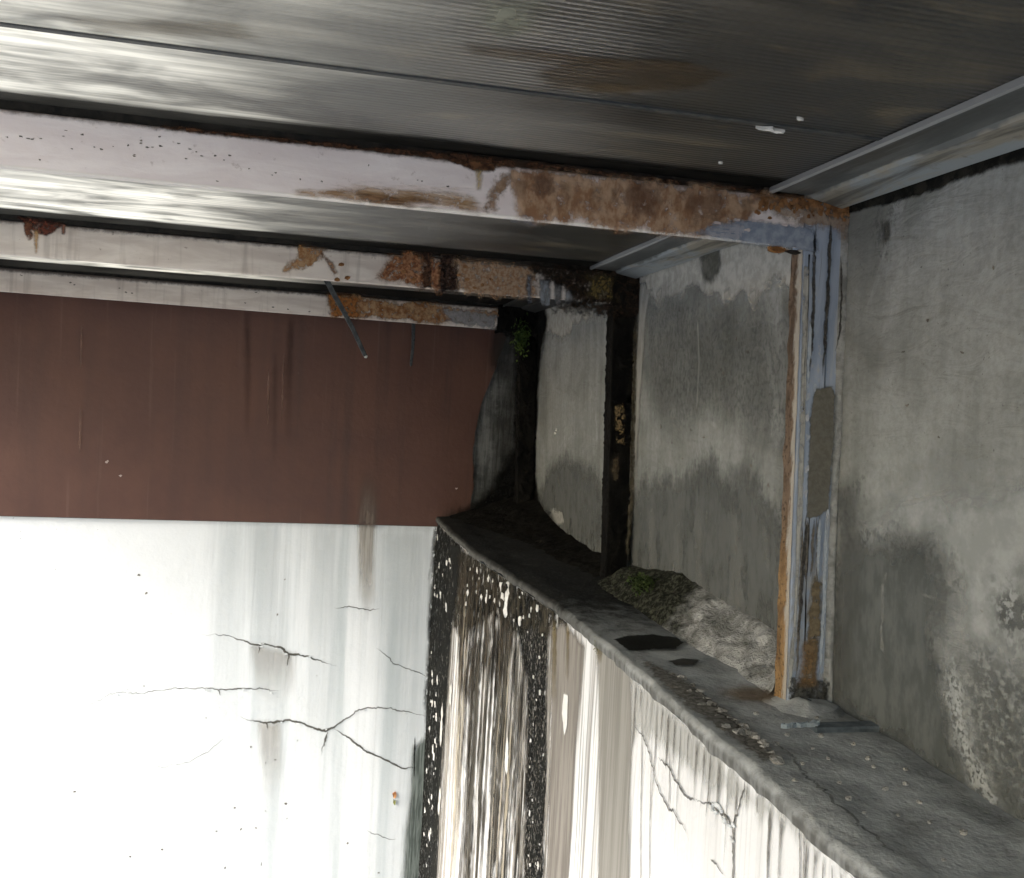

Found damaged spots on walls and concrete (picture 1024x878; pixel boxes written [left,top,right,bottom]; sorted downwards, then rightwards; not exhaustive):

rust [160,126,850,239]
rust [18,217,66,252]
rust [283,245,350,281]
rust [328,251,537,329]
damp [467,263,780,633]
rust [730,246,822,701]
damp [359,499,375,581]
crack [216,634,325,665]
damp [789,489,1024,819]
crack [91,687,273,704]
crack [251,707,413,769]
crack [635,727,745,878]